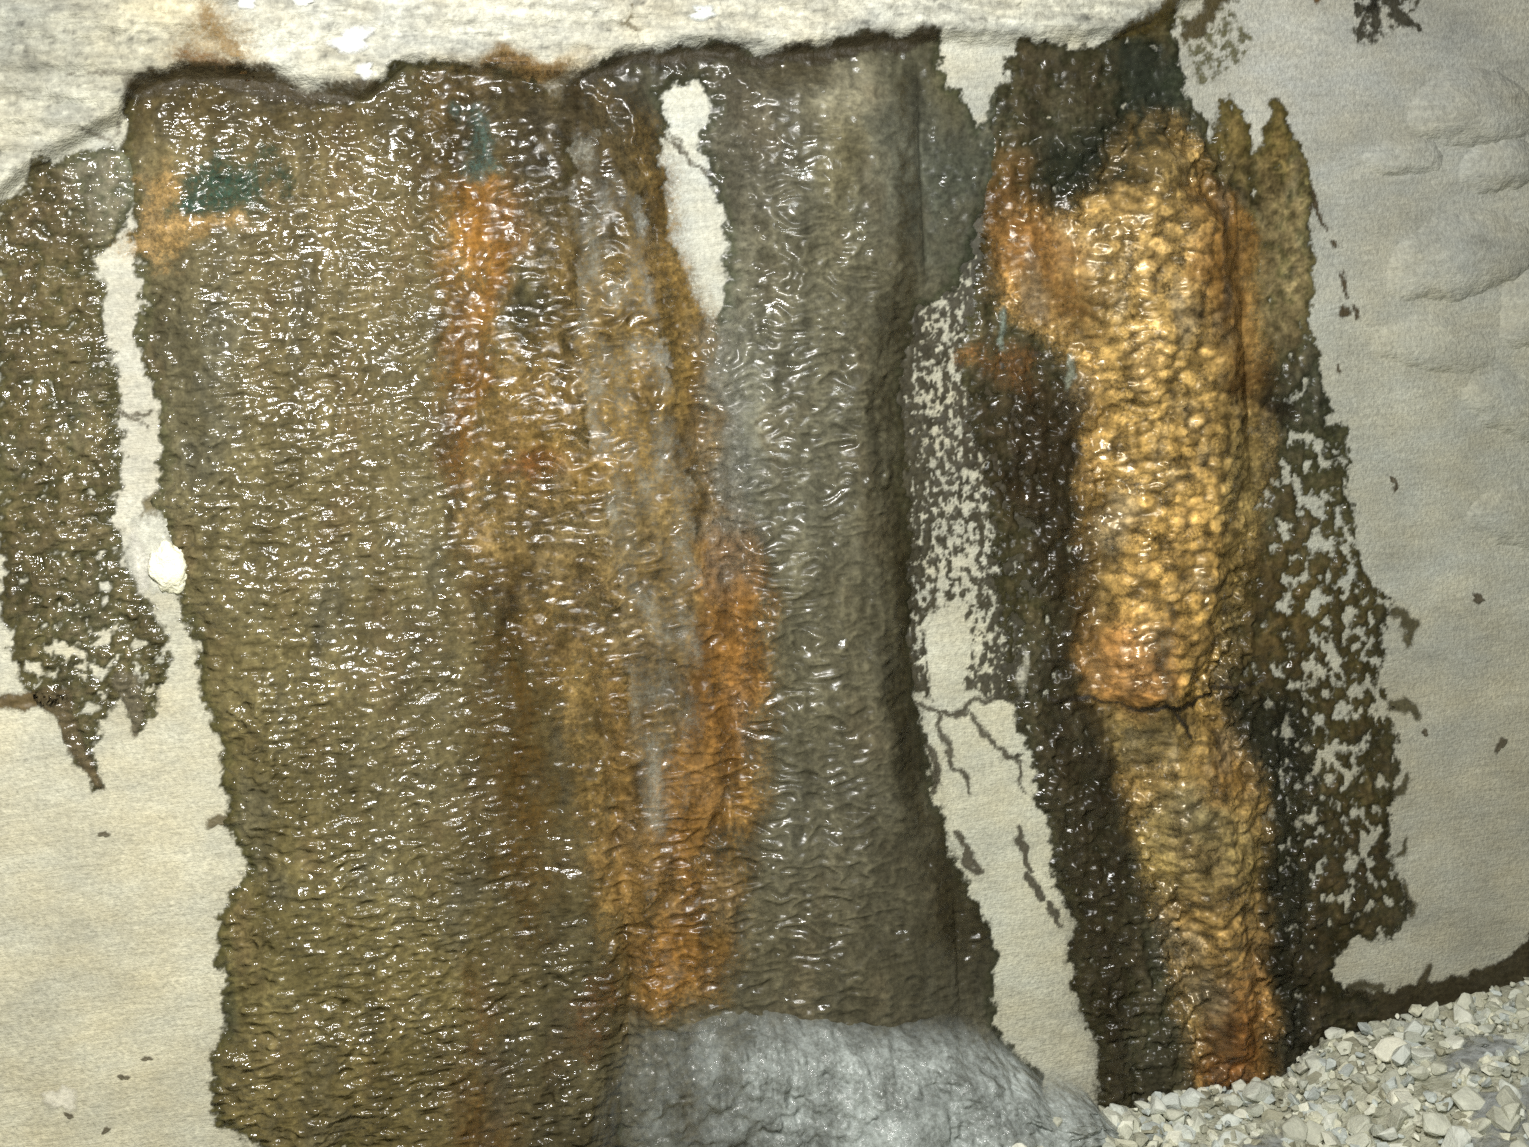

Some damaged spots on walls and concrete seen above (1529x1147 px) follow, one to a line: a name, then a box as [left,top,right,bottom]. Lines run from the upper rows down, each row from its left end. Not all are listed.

damp [479,64,512,142]
damp [527,131,577,233]
damp [451,228,556,312]
damp [1114,208,1194,313]
damp [461,323,542,388]
damp [528,373,592,460]
damp [502,438,586,538]
rust [417,45,781,1025]
damp [522,560,621,642]
rust [990,112,1279,1089]
damp [1379,688,1420,720]
crack [914,696,1062,928]